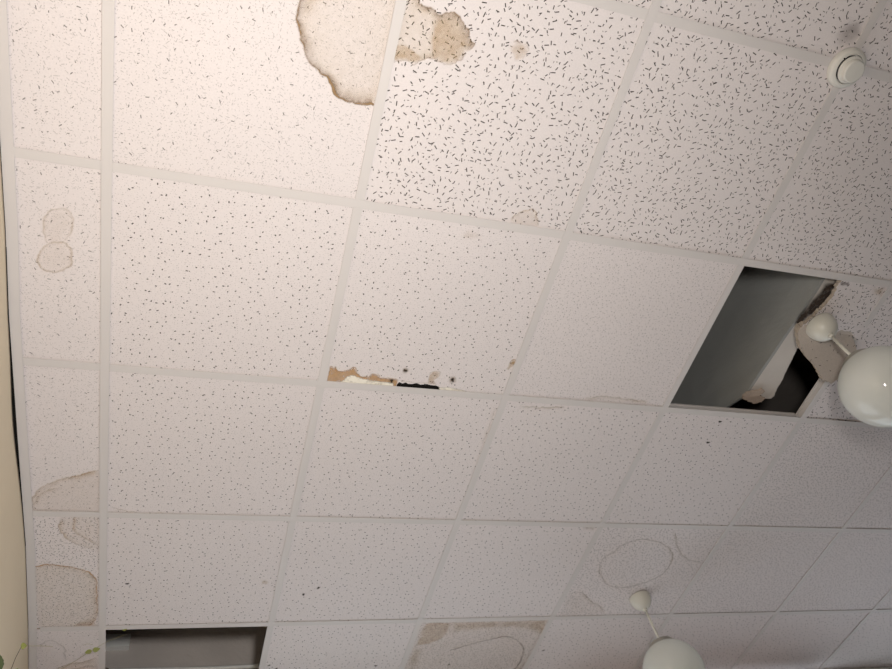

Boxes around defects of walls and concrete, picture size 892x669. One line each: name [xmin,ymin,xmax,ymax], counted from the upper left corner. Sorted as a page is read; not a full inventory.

water stain [310,63,374,106]
spalling [390,369,440,390]